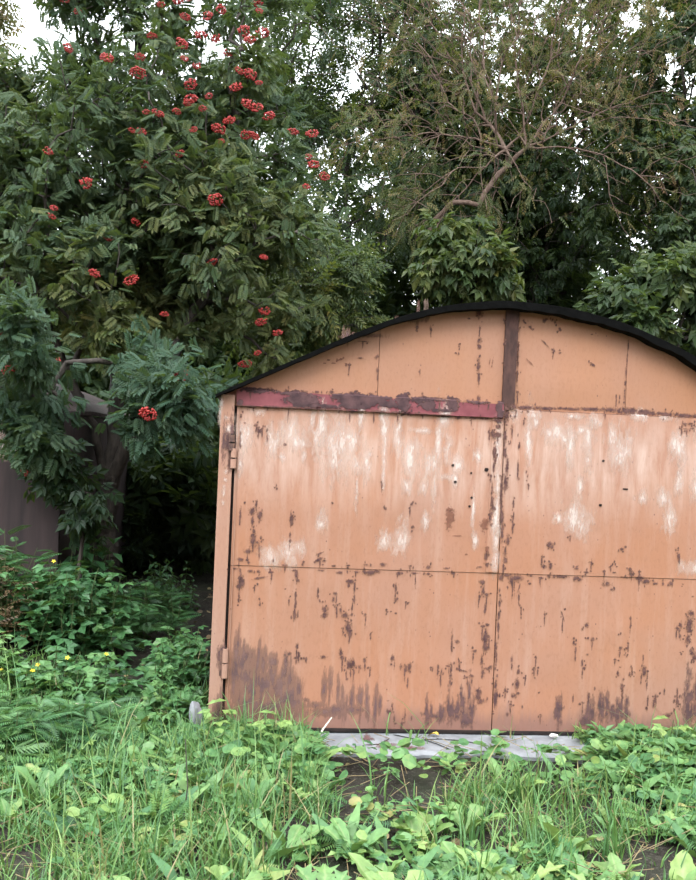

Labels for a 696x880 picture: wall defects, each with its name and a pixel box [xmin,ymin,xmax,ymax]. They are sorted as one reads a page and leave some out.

corrosion [211,327,696,735]